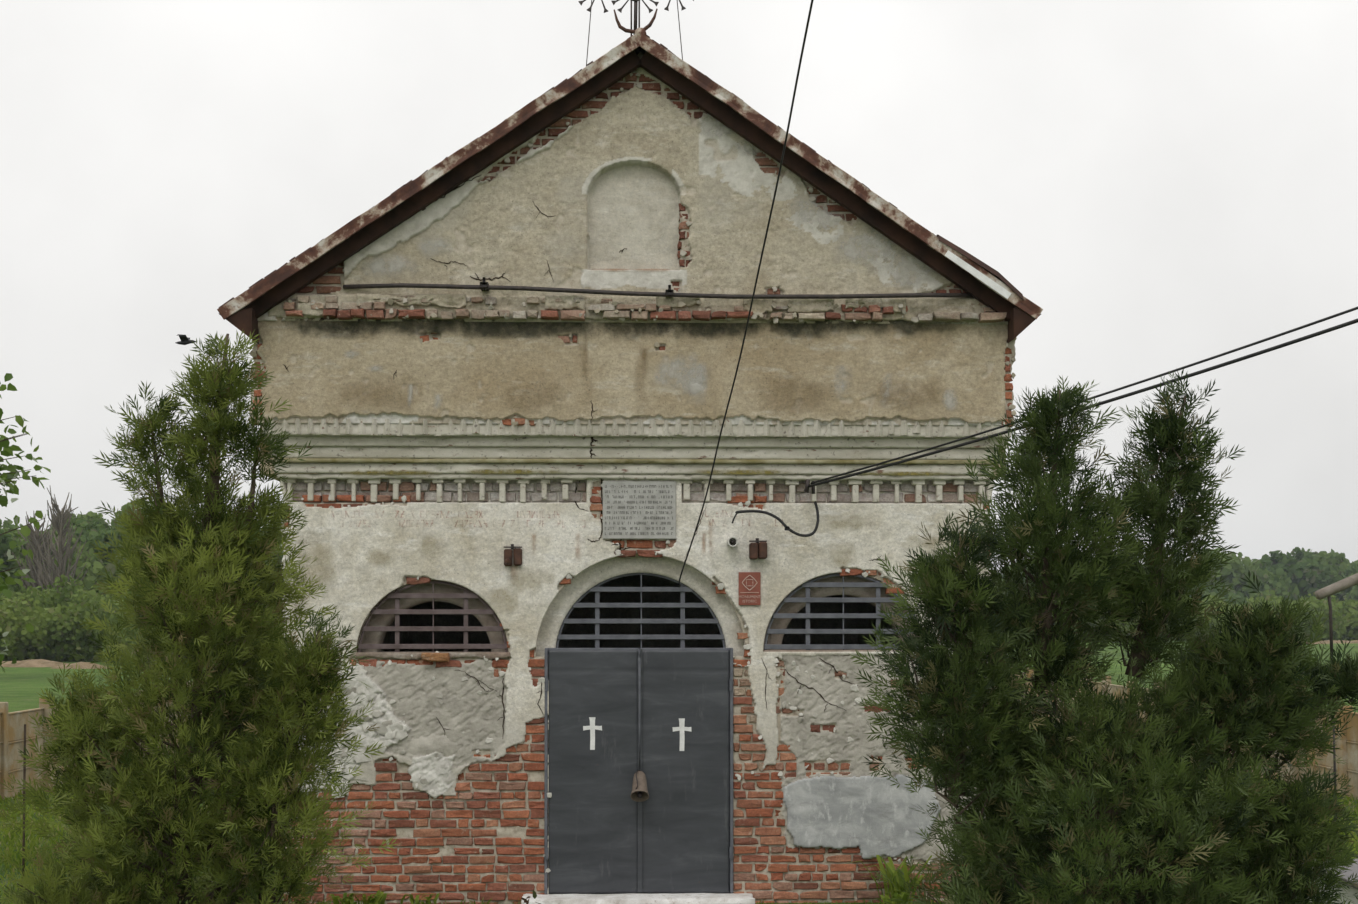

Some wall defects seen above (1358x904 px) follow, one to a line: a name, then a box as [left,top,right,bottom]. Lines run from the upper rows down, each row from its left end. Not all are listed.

flaking render [478,69,708,182]
flaking render [671,203,692,292]
flaking render [1002,343,1016,427]
flaking render [284,494,411,527]
flaking render [590,484,603,519]
flaking render [728,496,767,509]
flaking render [283,623,552,904]
flaking render [733,625,963,903]